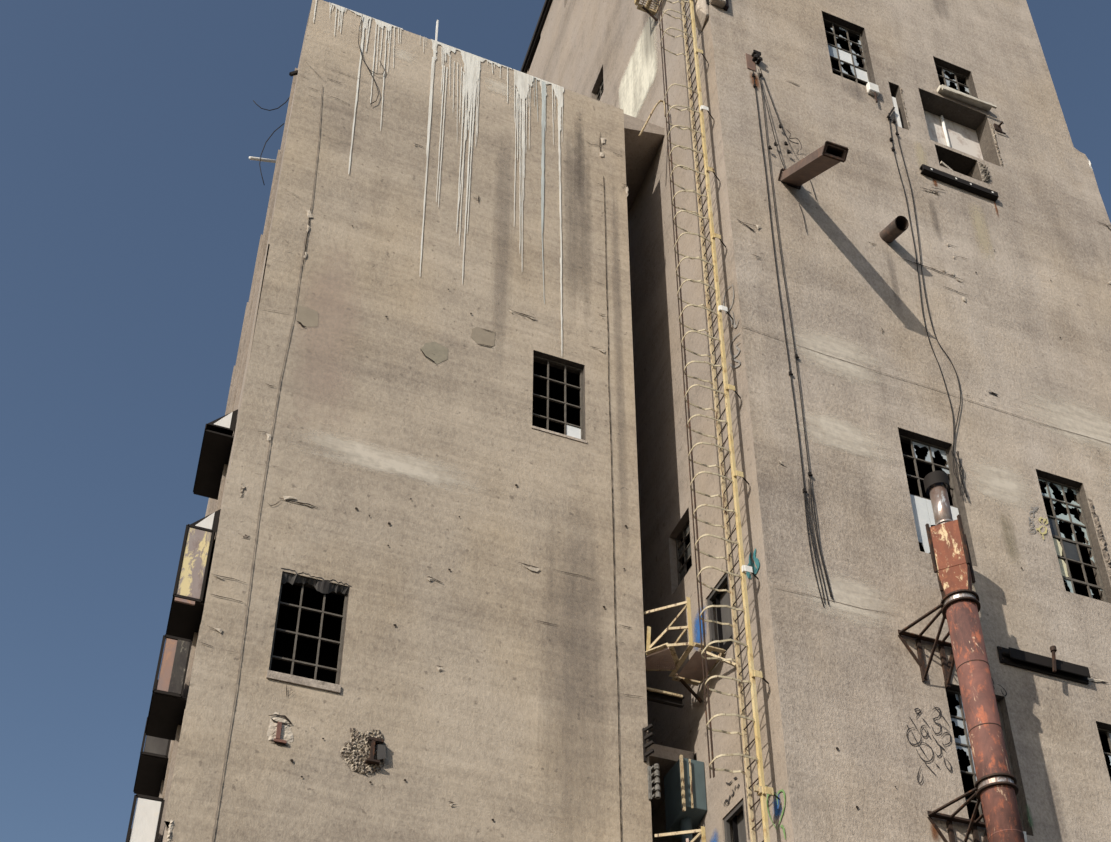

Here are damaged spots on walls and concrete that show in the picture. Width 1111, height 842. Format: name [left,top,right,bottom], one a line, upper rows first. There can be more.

damp [313,0,411,174]
damp [420,35,564,353]
spalling [267,712,293,746]
spalling [340,728,386,777]